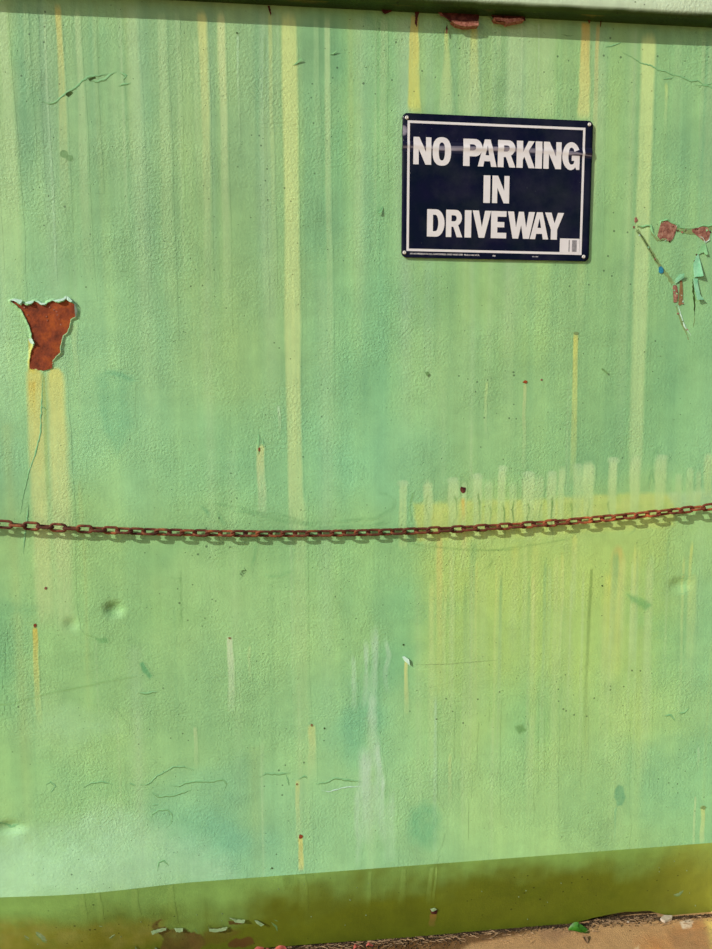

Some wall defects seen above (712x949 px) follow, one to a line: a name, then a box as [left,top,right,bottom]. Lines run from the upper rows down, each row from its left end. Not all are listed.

corrosion [491,15,526,27]
crack [43,71,129,105]
crack [607,42,712,89]
peeling [633,217,712,340]
peeling [8,296,79,372]
crack [20,372,47,552]
leakage [395,452,712,851]
crack [84,766,227,798]
crack [264,772,358,785]